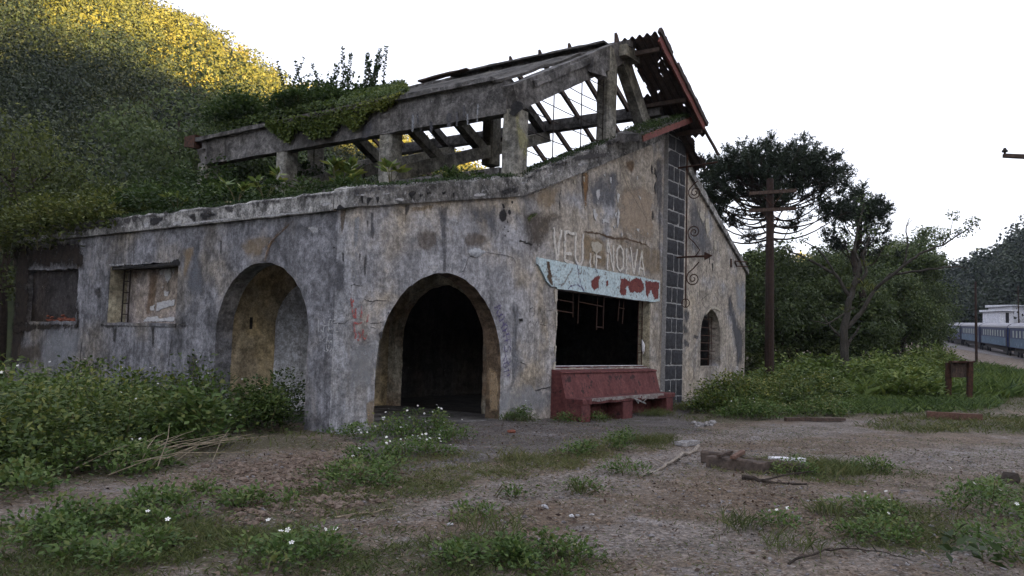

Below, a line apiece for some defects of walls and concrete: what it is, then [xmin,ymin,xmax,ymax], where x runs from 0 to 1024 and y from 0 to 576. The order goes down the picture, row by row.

water stain [590,173,618,205]
water stain [728,285,745,364]